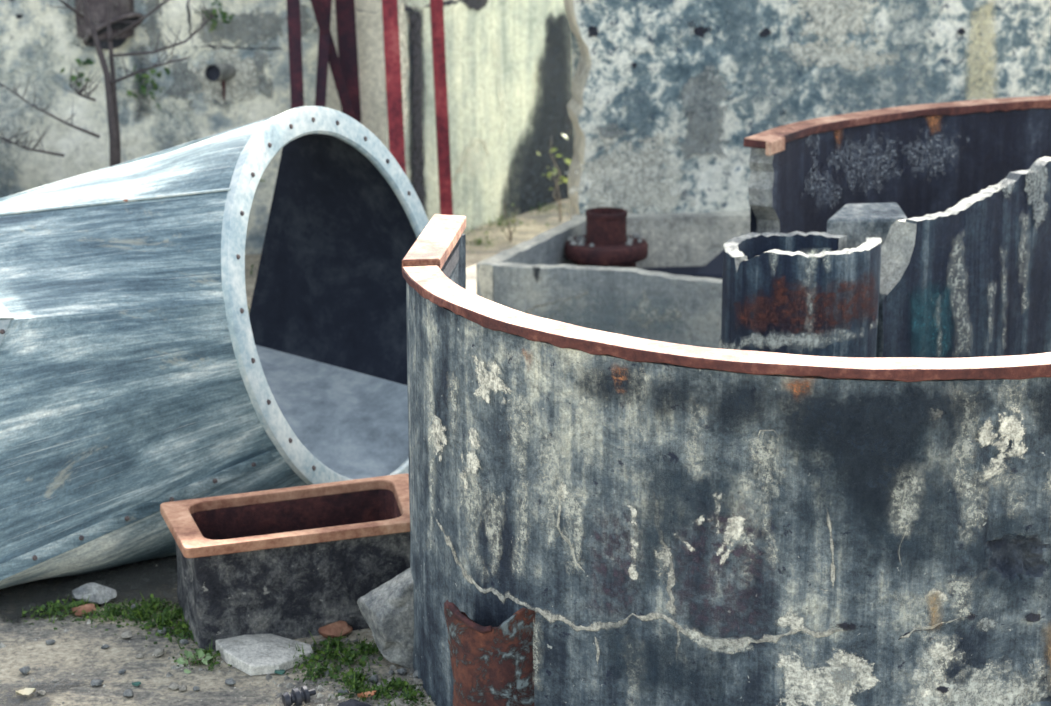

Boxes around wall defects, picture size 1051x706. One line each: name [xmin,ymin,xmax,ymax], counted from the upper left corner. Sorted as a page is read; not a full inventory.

rust [736,277,876,333]
flaking render [474,356,511,403]
water stain [541,436,586,554]
crack [436,483,844,664]
water stain [592,444,766,633]
water stain [578,371,993,570]
crack [898,483,908,565]
spalling [949,503,1051,632]
flaking render [979,407,1027,480]
crack [898,616,968,640]
flaking render [778,650,879,706]
flaking render [908,642,1045,706]